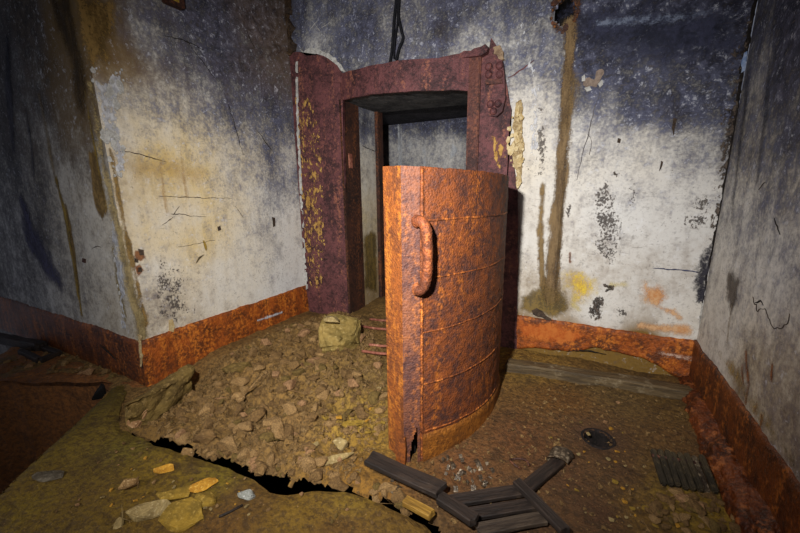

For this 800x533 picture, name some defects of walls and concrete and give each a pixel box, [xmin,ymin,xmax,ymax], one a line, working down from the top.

spalling [550,0,580,34]
water stain [51,0,148,340]
peeling [90,67,126,178]
flaking render [492,87,540,189]
water stain [536,126,546,175]
water stain [589,171,625,264]
water stain [154,261,197,322]
crack [753,297,790,329]